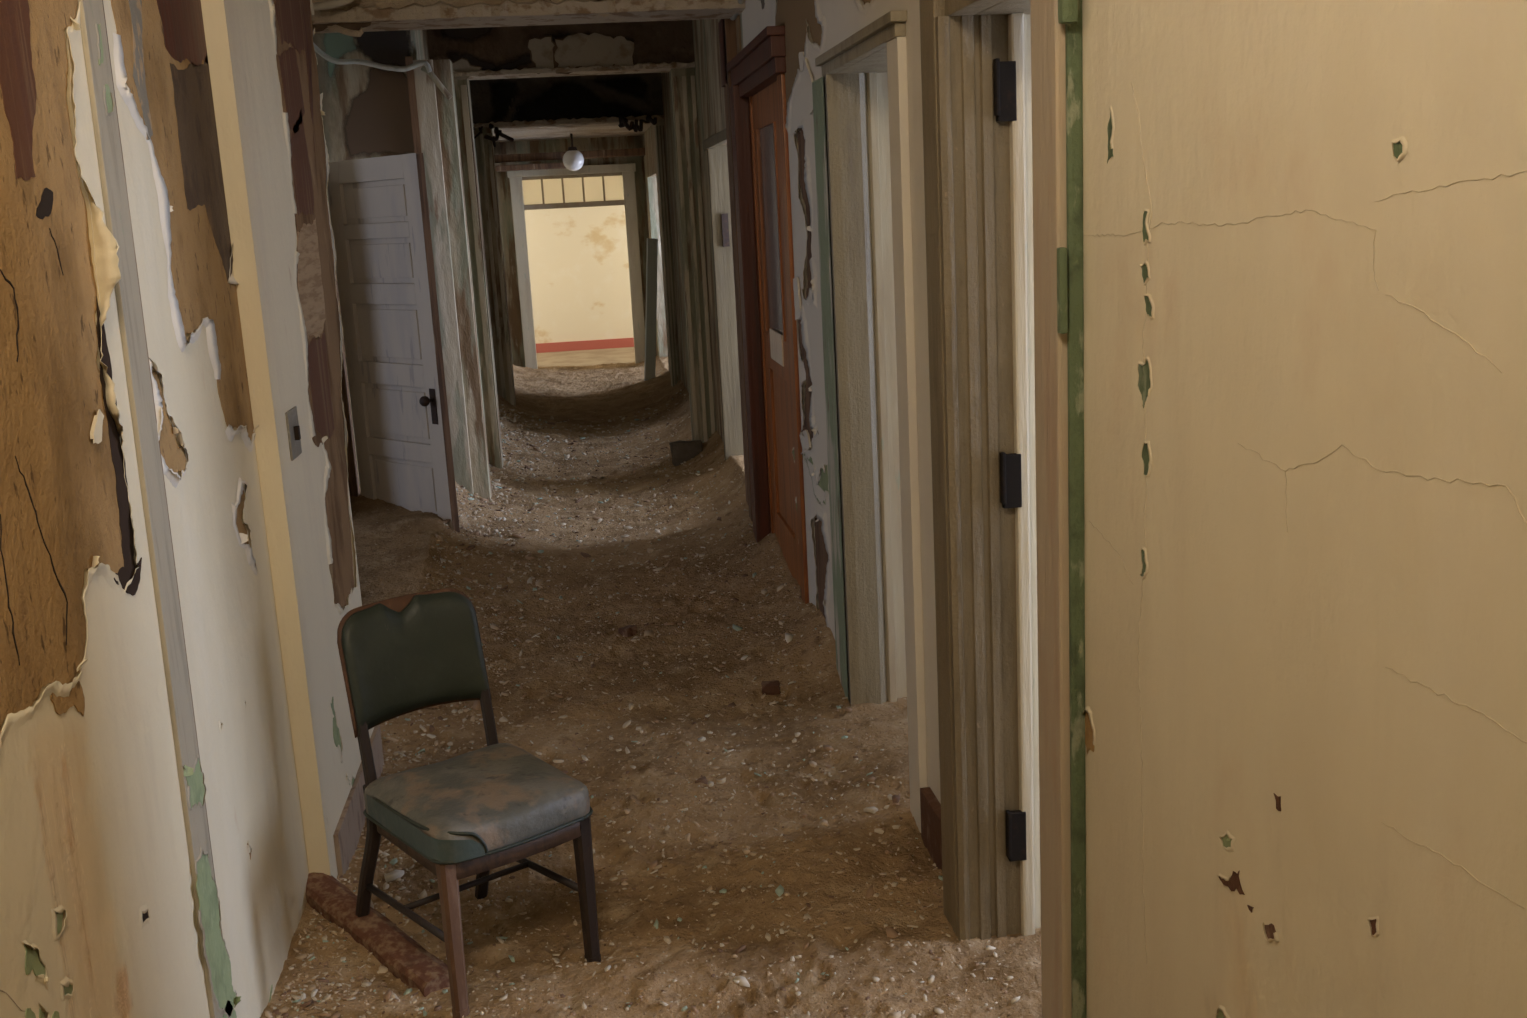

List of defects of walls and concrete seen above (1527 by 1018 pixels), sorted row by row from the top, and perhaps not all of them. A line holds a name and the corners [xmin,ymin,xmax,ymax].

flaking render [0,0,259,745]
flaking render [258,0,745,615]
flaking render [775,0,832,628]
crack [1085,171,1526,373]
crack [1238,443,1527,532]
peeling [183,755,206,810]
peeling [23,904,74,1018]
peeling [195,848,241,1018]
spalling [1217,871,1279,943]
spalling [1367,916,1380,938]